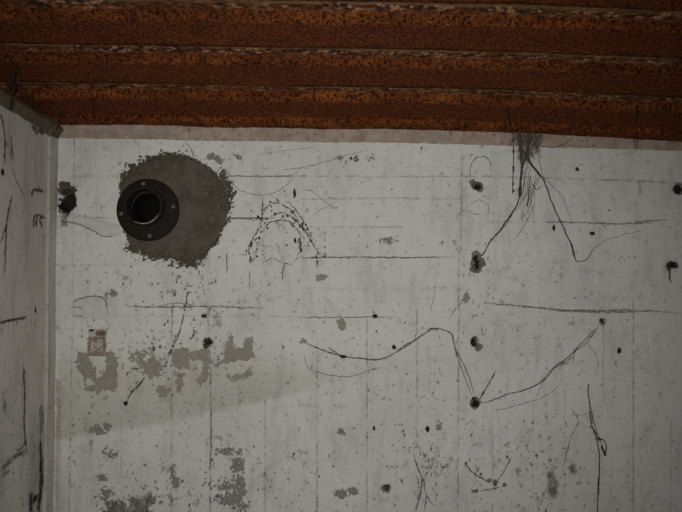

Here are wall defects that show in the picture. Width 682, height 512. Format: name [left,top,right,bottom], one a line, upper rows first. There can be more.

spalling [59,194,77,213]
crack [547,219,658,227]
peeling [76,350,118,394]
peeling [128,334,256,397]
crack [305,328,596,410]
peeling [97,474,163,512]
peeling [169,464,180,492]
peeling [211,445,250,512]